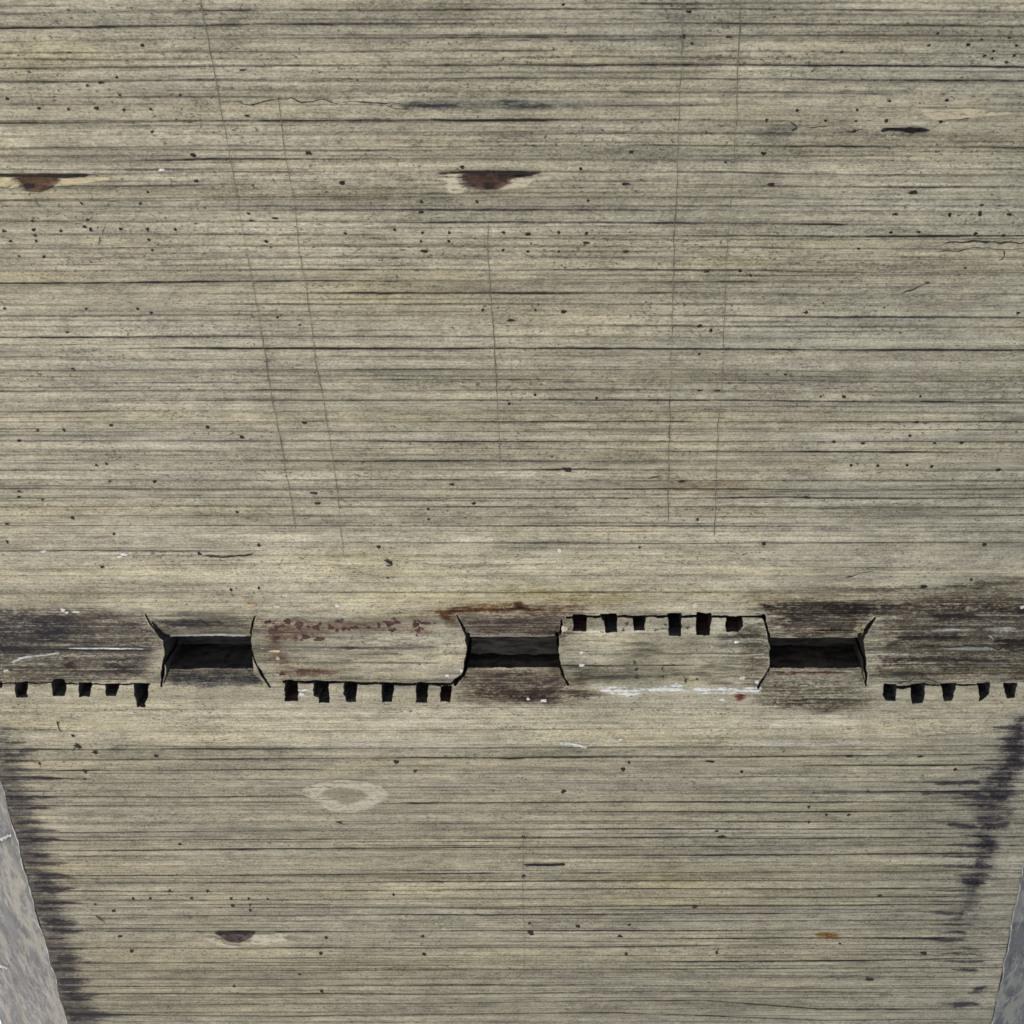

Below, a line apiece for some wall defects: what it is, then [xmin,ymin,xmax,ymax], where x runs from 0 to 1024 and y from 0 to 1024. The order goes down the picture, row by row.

spalling [151,603,256,683]
rust [264,602,539,643]
spalling [445,620,569,686]
spalling [739,614,870,687]
water stain [932,627,1016,678]
water stain [591,683,762,697]
water stain [930,727,1023,807]
water stain [949,824,1006,902]